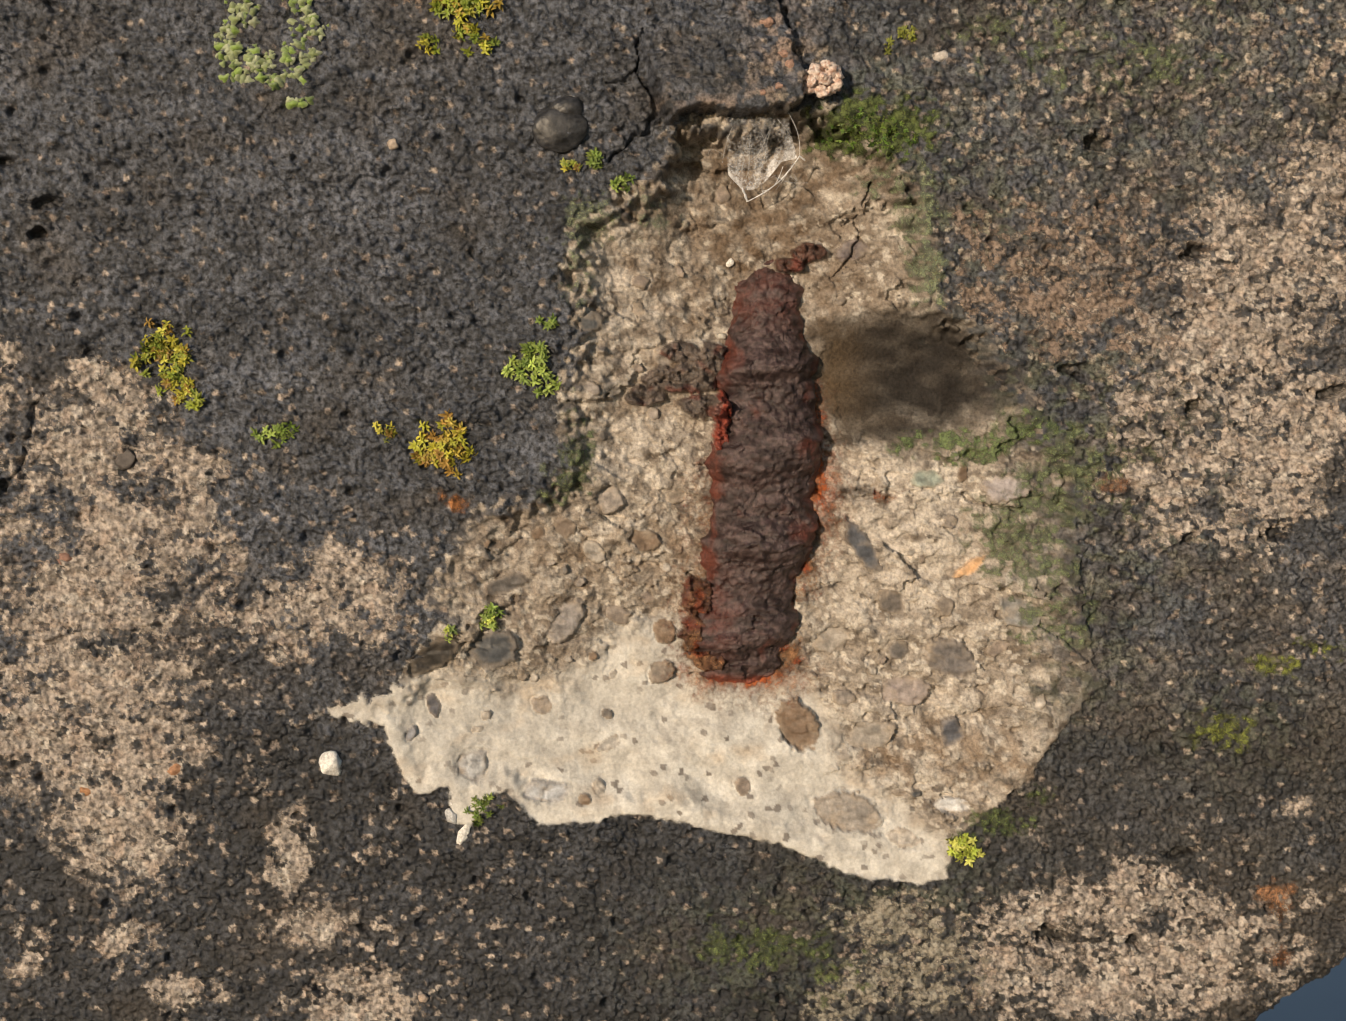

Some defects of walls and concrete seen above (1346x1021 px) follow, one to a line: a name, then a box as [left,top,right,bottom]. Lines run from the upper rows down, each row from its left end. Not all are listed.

crack [606,28,665,164]
spalling [1076,126,1123,163]
spalling [328,0,1104,886]
rust [796,449,893,596]
rust [677,568,726,689]
rust [744,640,802,690]